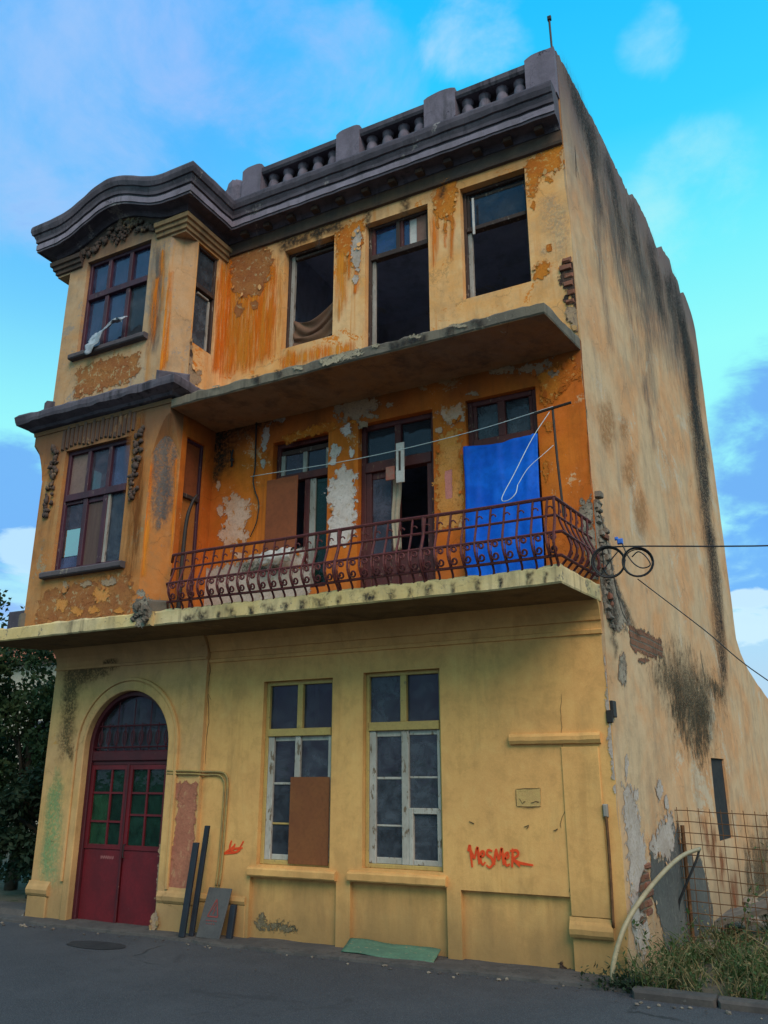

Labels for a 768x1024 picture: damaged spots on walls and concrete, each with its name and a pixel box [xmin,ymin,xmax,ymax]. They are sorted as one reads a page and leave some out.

peeling [523,144,565,210]
peeling [334,219,367,284]
rust [432,220,454,265]
rust [213,259,281,373]
peeling [72,351,142,400]
water stain [151,436,176,528]
peeling [260,397,394,550]
water stain [568,79,726,758]
peeling [34,571,153,628]
flaking render [204,481,312,606]
spalling [579,491,663,710]
flaking render [607,723,682,962]